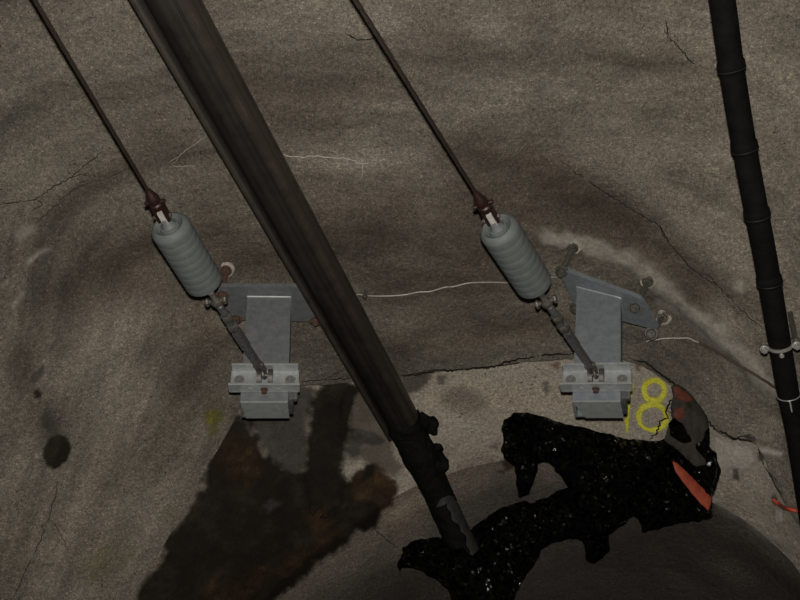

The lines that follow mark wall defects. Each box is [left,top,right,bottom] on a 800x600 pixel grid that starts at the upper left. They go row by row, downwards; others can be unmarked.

crack [664,22,696,66]
crack [0,151,130,231]
crack [564,163,765,330]
leakage [540,230,777,394]
crack [401,353,573,377]
crack [631,359,675,440]
leakage [34,416,71,469]
corrosion [346,464,397,531]